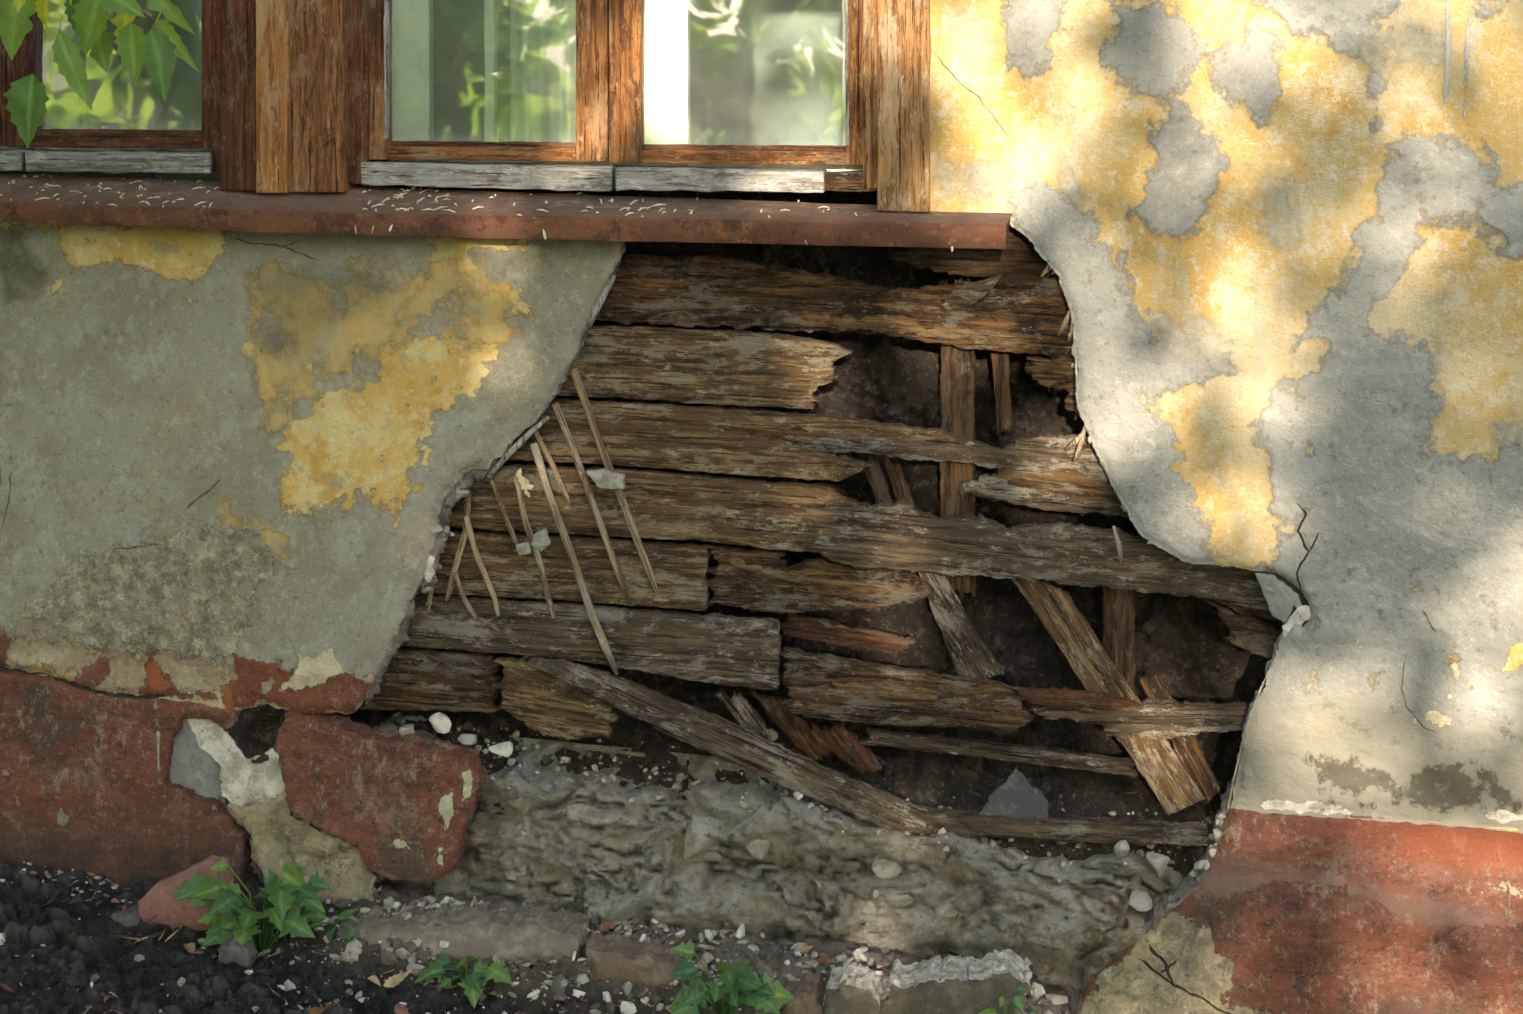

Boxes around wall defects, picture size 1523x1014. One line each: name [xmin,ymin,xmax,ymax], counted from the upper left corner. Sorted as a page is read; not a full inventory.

peeling [0,222,239,306]
peeling [241,237,537,529]
spalling [1040,259,1133,565]
spalling [586,468,625,489]
crack [1266,503,1319,627]
crack [0,666,169,699]
spalling [0,416,551,905]
spalling [1075,572,1311,1014]
spalling [1260,798,1354,816]
leakage [1306,754,1522,814]
spalling [1485,809,1523,824]
crack [1138,945,1232,1014]